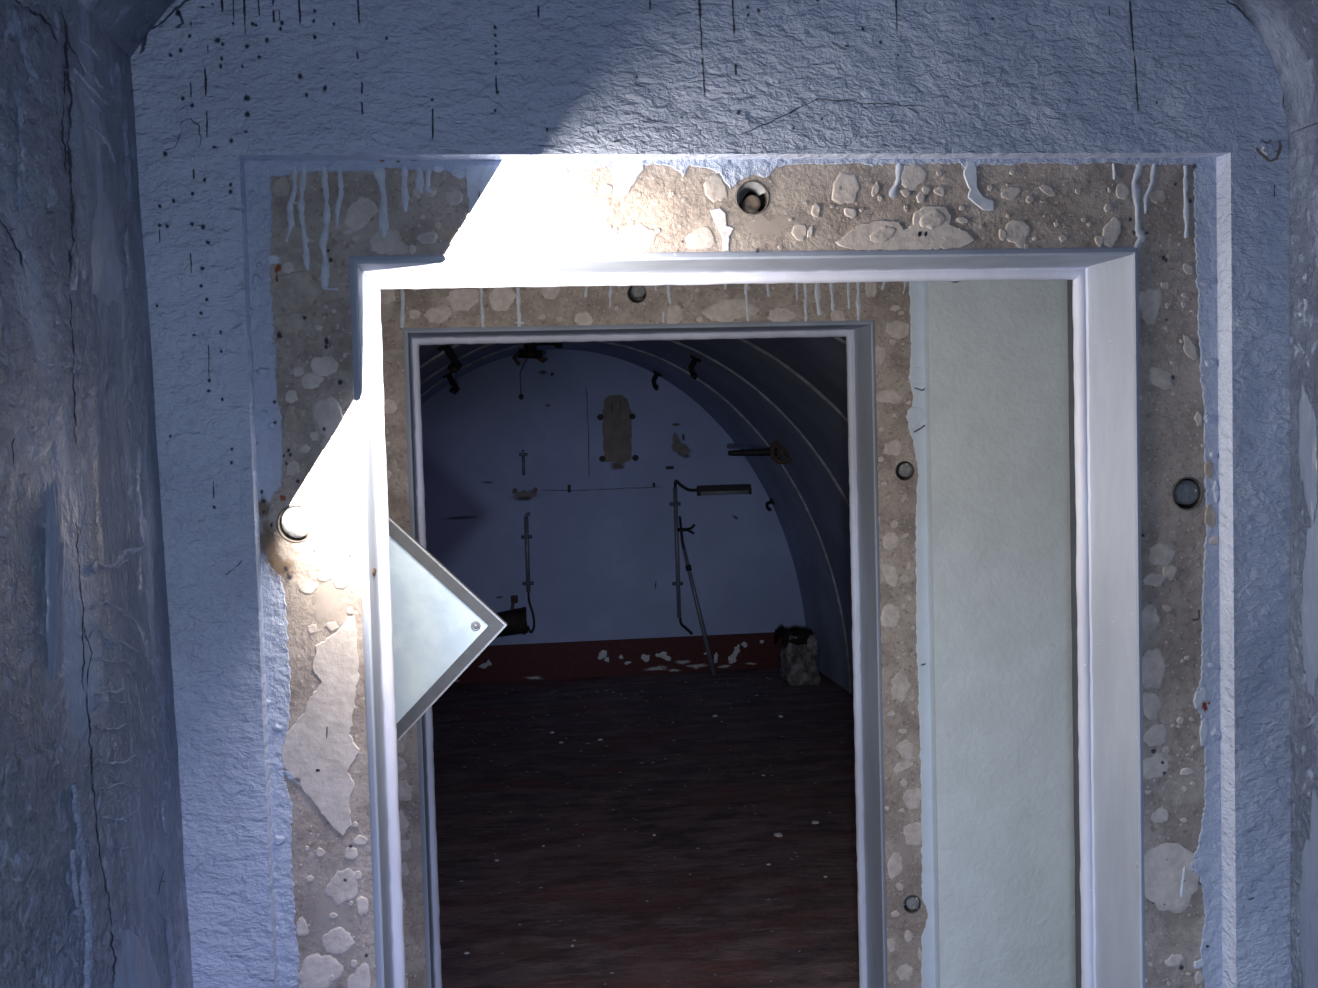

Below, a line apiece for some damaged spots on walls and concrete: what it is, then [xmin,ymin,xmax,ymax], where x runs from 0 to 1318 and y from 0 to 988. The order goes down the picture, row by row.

crack [742,98,916,134]
crack [15,0,84,444]
water stain [298,167,344,291]
water stain [401,166,434,212]
water stain [1129,161,1156,235]
water stain [1174,164,1196,238]
water stain [514,287,524,327]
water stain [803,282,861,322]
crack [75,519,116,984]